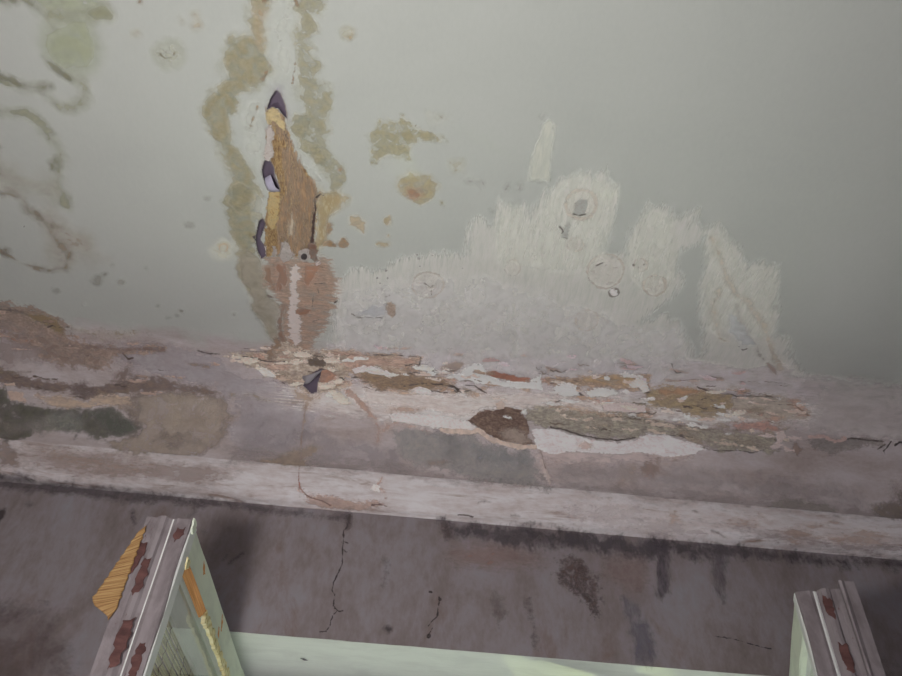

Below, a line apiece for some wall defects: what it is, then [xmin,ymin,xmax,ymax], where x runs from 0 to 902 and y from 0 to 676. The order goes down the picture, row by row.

leakage [11,0,112,81]
leakage [203,0,281,342]
peeling [263,107,345,266]
leakage [291,0,346,195]
leakage [0,300,233,455]
crack [298,404,351,632]
spalling [197,338,884,464]
mould [558,556,602,615]
leakage [653,538,669,598]
crack [877,441,902,453]